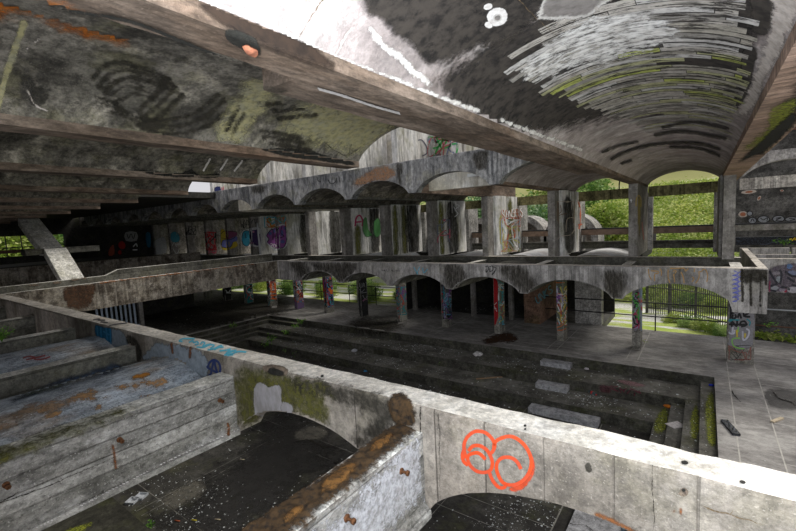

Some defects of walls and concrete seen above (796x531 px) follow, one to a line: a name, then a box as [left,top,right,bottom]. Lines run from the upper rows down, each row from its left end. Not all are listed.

rust [62,23,125,42]
damp [740,113,796,162]
rust [0,388,111,431]
rust [116,372,168,397]
peeling [254,364,293,417]
damp [295,377,396,448]
damp [148,412,343,531]